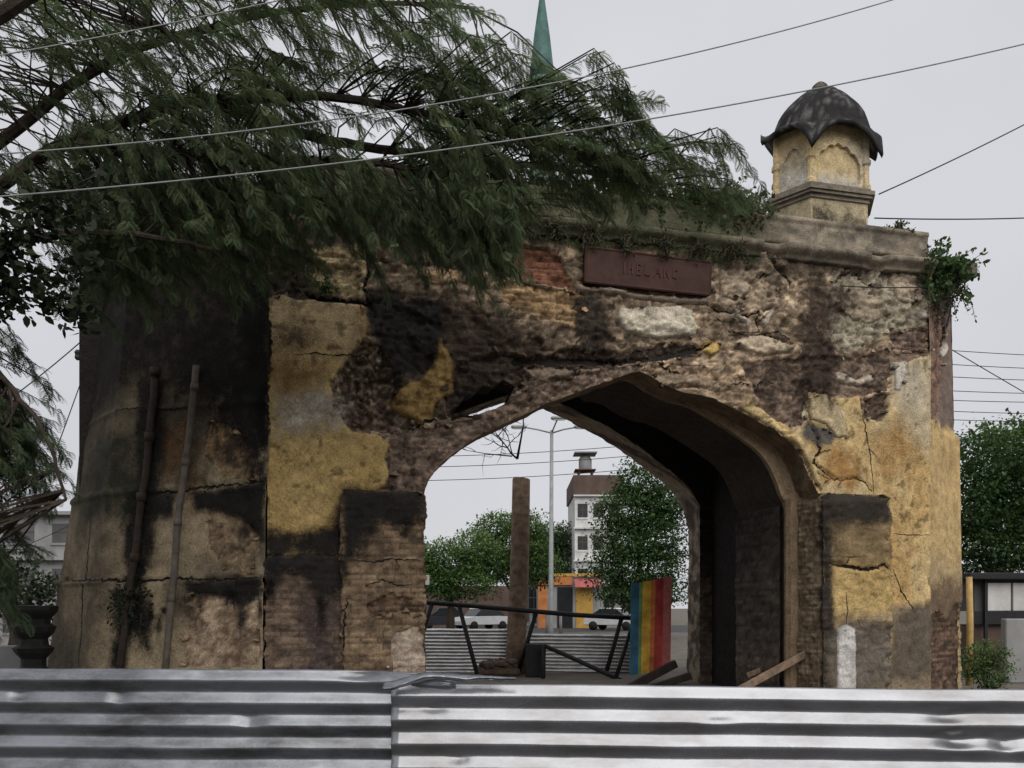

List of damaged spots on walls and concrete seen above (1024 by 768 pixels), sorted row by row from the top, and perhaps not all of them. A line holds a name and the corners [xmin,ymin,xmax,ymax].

crack [158,480,265,494]
damp [91,219,476,670]
crack [267,264,376,436]
spalling [331,263,949,491]
damp [713,255,952,408]
crack [808,395,877,494]
crack [68,509,258,665]
spalling [367,594,426,673]
damp [815,493,892,688]
crack [829,556,916,611]